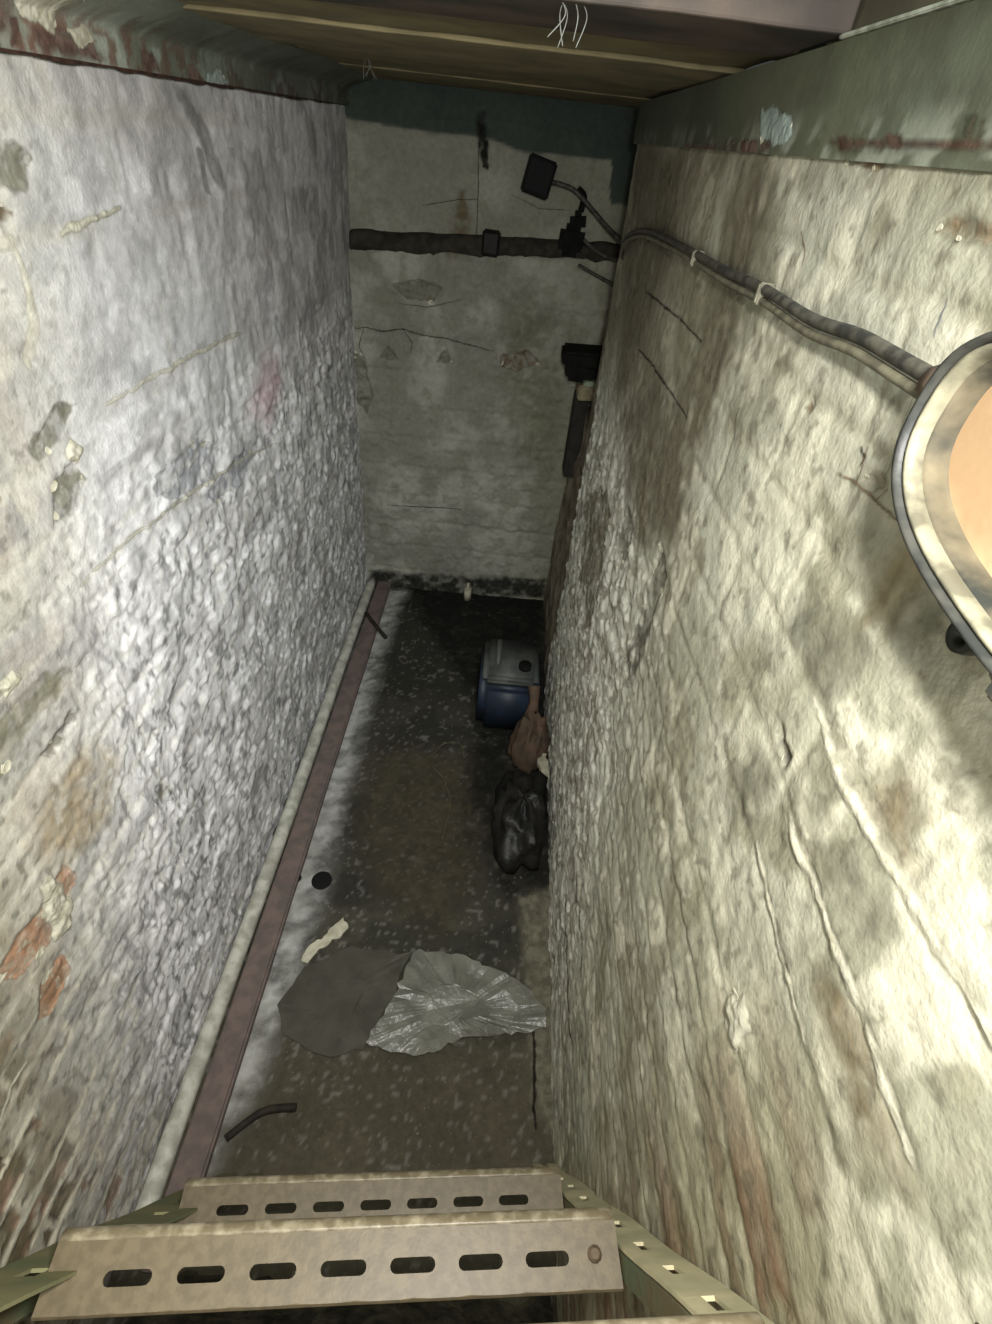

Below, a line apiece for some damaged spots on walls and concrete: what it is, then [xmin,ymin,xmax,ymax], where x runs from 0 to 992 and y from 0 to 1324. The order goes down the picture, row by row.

peeling [14,0,94,49]
peeling [206,68,228,85]
flaking render [0,141,32,191]
corrosion [838,134,992,150]
peeling [60,206,121,236]
flaking render [29,402,86,521]
flaking render [0,668,76,777]
spalling [0,864,76,1020]